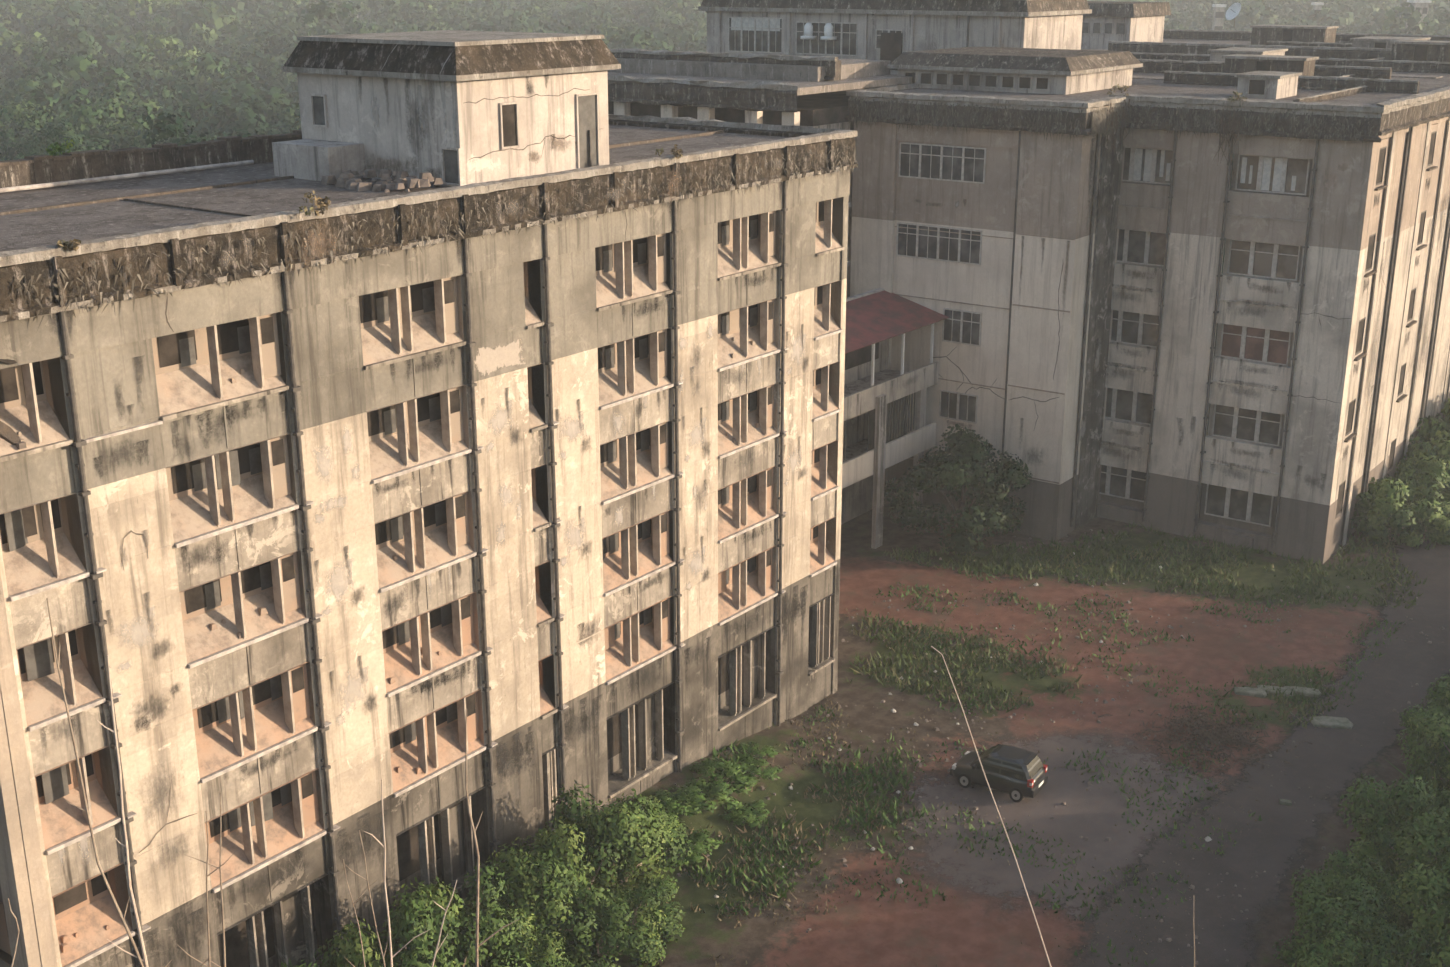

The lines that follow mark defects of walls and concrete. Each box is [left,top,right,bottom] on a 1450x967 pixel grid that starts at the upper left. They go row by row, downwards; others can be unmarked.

damp [406,79,456,129]
damp [50,311,73,333]
damp [133,356,142,384]
damp [137,685,179,728]
damp [565,657,662,740]
damp [497,726,533,779]